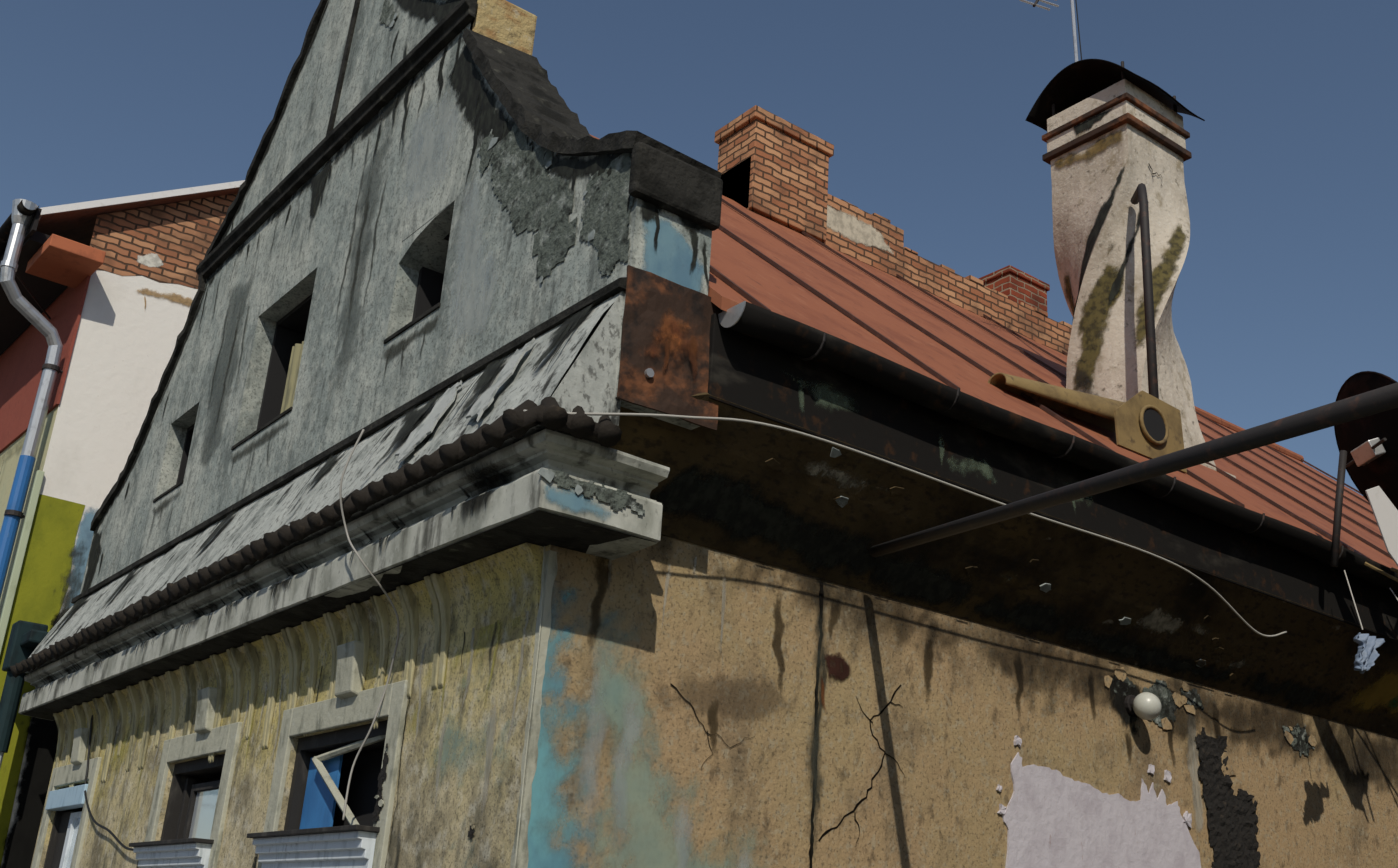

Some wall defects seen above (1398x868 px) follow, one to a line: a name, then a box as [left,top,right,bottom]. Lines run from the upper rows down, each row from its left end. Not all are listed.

flaking render [477,123,636,283]
leakage [45,0,514,653]
peeling [538,467,555,483]
leakage [527,616,728,868]
crack [670,684,755,768]
leakage [772,601,785,688]
crack [814,582,824,731]
crack [809,684,904,868]
leakage [786,573,948,815]
leakage [990,630,1139,758]
peeling [996,667,1261,868]
leakage [1161,679,1398,782]